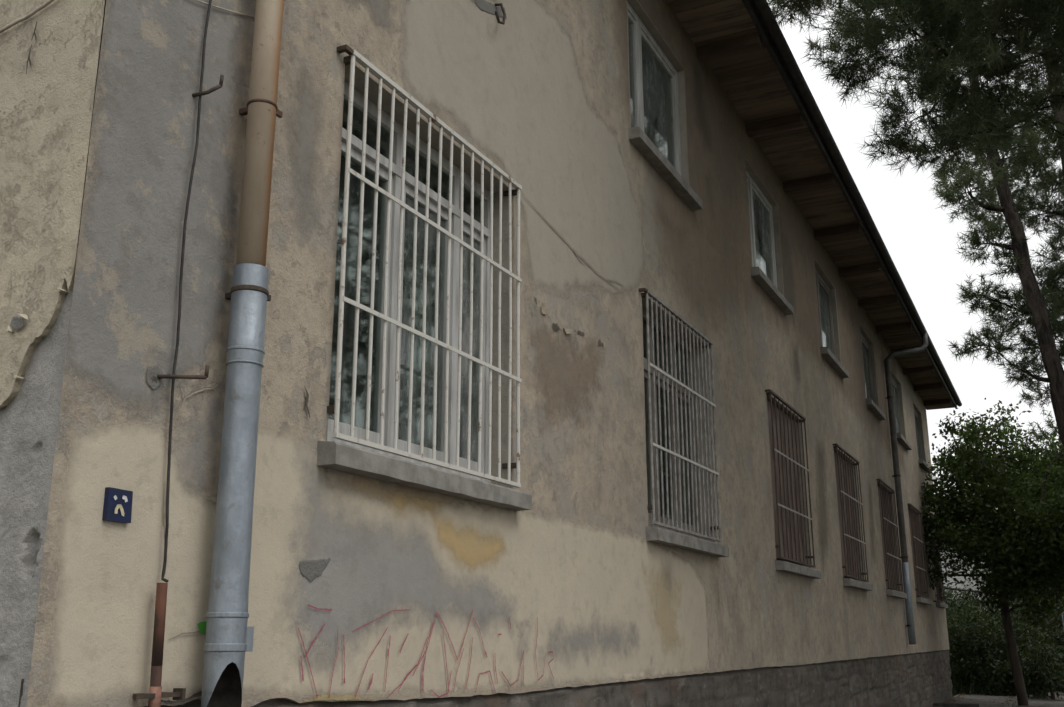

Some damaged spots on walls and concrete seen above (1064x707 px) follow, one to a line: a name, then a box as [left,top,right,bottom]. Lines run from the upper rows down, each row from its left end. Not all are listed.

flaking render [0,288,73,707]
flaking render [299,558,330,582]